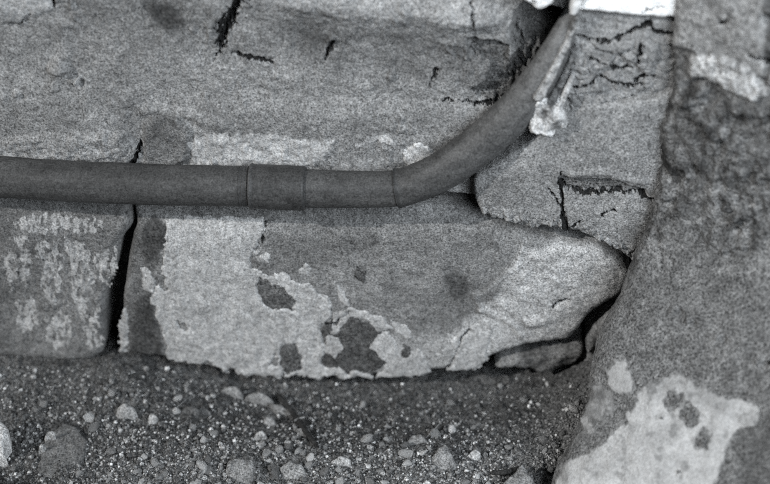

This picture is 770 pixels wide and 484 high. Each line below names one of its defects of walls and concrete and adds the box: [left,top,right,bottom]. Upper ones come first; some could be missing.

crack [213,0,273,64]
crack [573,6,674,98]
crack [548,171,654,232]
flaking render [140,214,432,380]
flaking render [117,306,129,353]
flaking render [446,318,496,371]